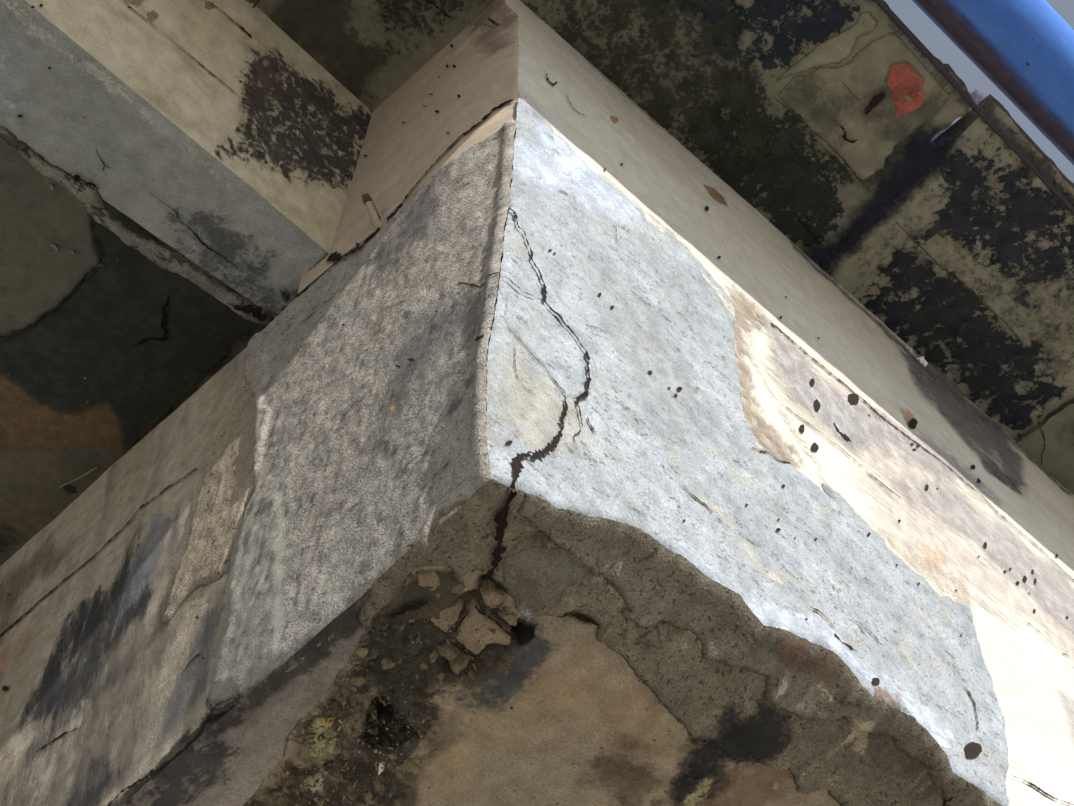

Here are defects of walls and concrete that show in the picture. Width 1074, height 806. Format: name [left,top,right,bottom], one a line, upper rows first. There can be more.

corrosion [917,0,1074,160]
crack [74,149,110,189]
crack [234,304,266,322]
crack [457,208,596,580]
damp [215,0,1074,658]
peeling [728,284,802,468]
damp [0,518,219,806]
damp [126,741,240,806]
damp [244,624,555,806]
crack [557,613,598,626]
spalling [872,678,907,712]
spalling [965,742,982,758]